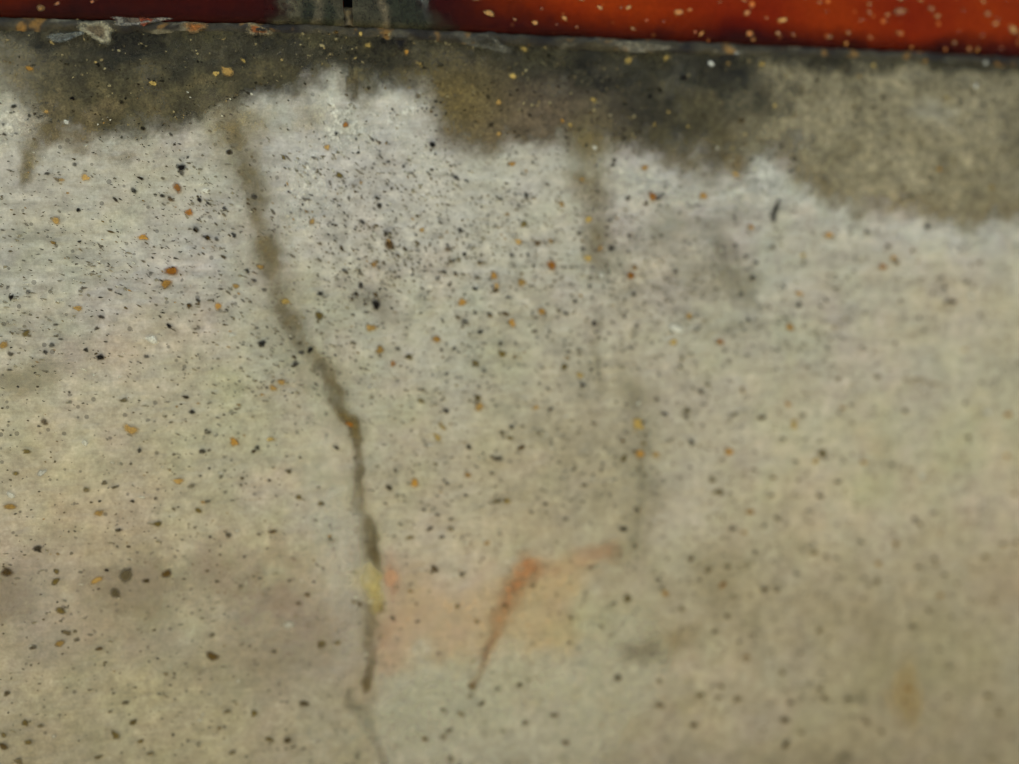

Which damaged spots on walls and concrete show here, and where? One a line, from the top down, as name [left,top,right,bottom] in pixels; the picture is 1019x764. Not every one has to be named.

crack [226,126,278,273]
leakage [0,0,1019,229]
crack [324,373,378,564]
crack [362,660,372,692]